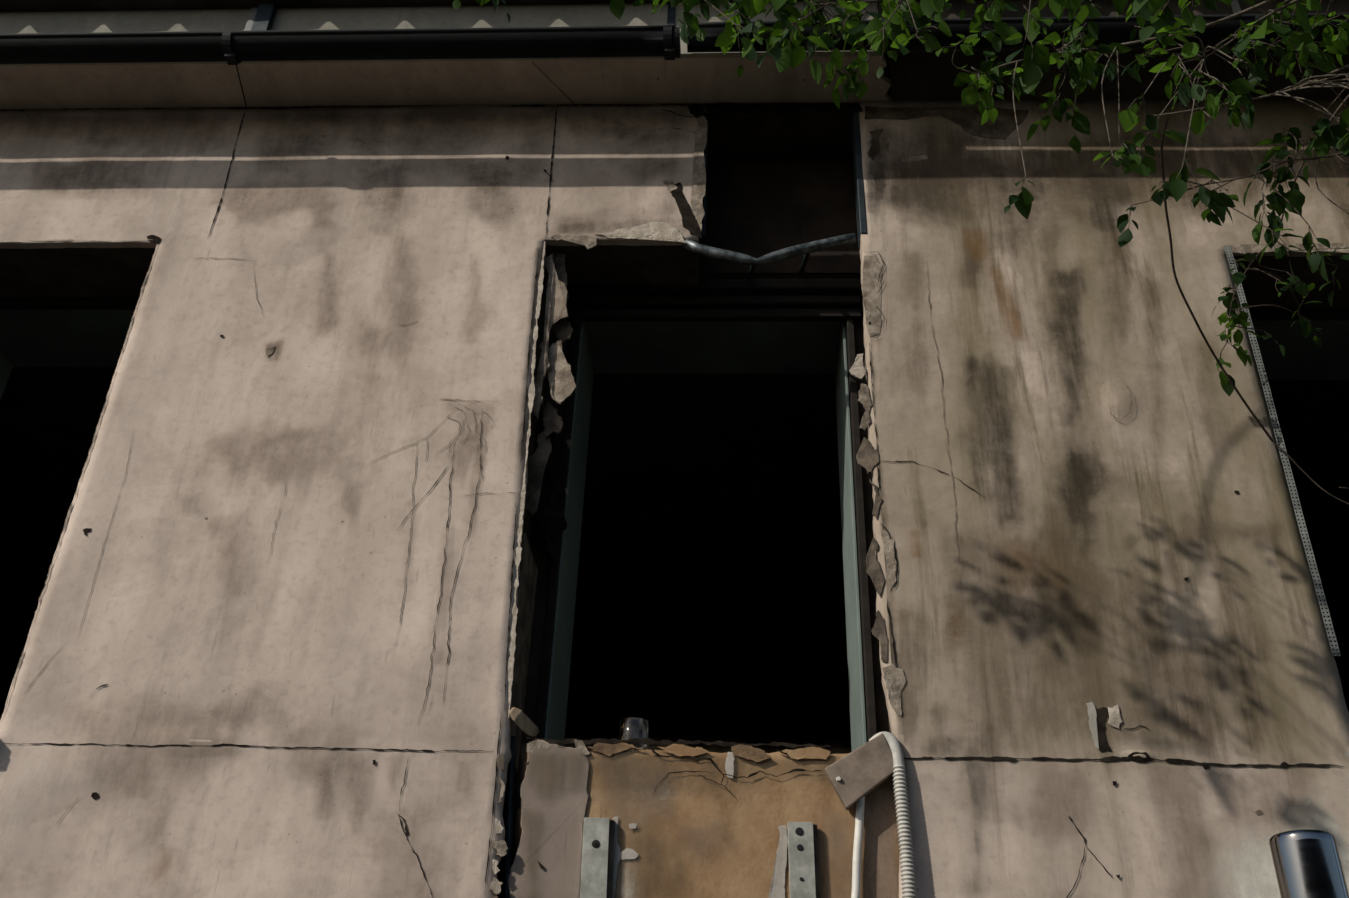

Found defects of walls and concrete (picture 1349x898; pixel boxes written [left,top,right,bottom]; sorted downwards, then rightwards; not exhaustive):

spalling [662,116,708,232]
crack [0,61,831,895]
peeling [525,222,687,563]
spalling [849,353,882,519]
leakage [1056,273,1080,417]
spalling [866,536,906,717]
peeling [489,739,709,898]
spalling [725,744,831,779]
crack [1066,816,1112,898]
crack [904,725,1343,767]